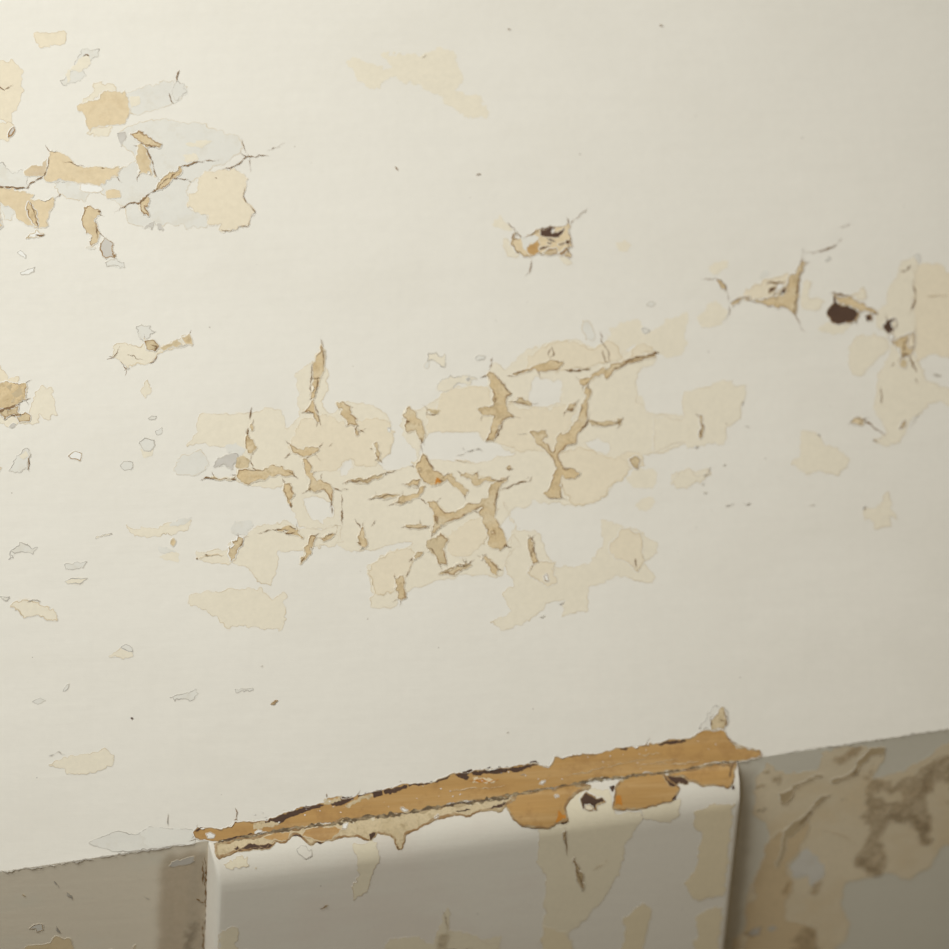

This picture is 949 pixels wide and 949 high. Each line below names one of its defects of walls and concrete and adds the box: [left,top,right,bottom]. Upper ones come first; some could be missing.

peeling [33,30,67,49]
peeling [0,48,256,269]
peeling [493,209,587,276]
peeling [743,260,808,316]
peeling [109,324,194,375]
peeling [825,253,949,447]
flaking render [0,365,58,429]
peeling [186,312,747,632]
peeling [88,704,949,949]